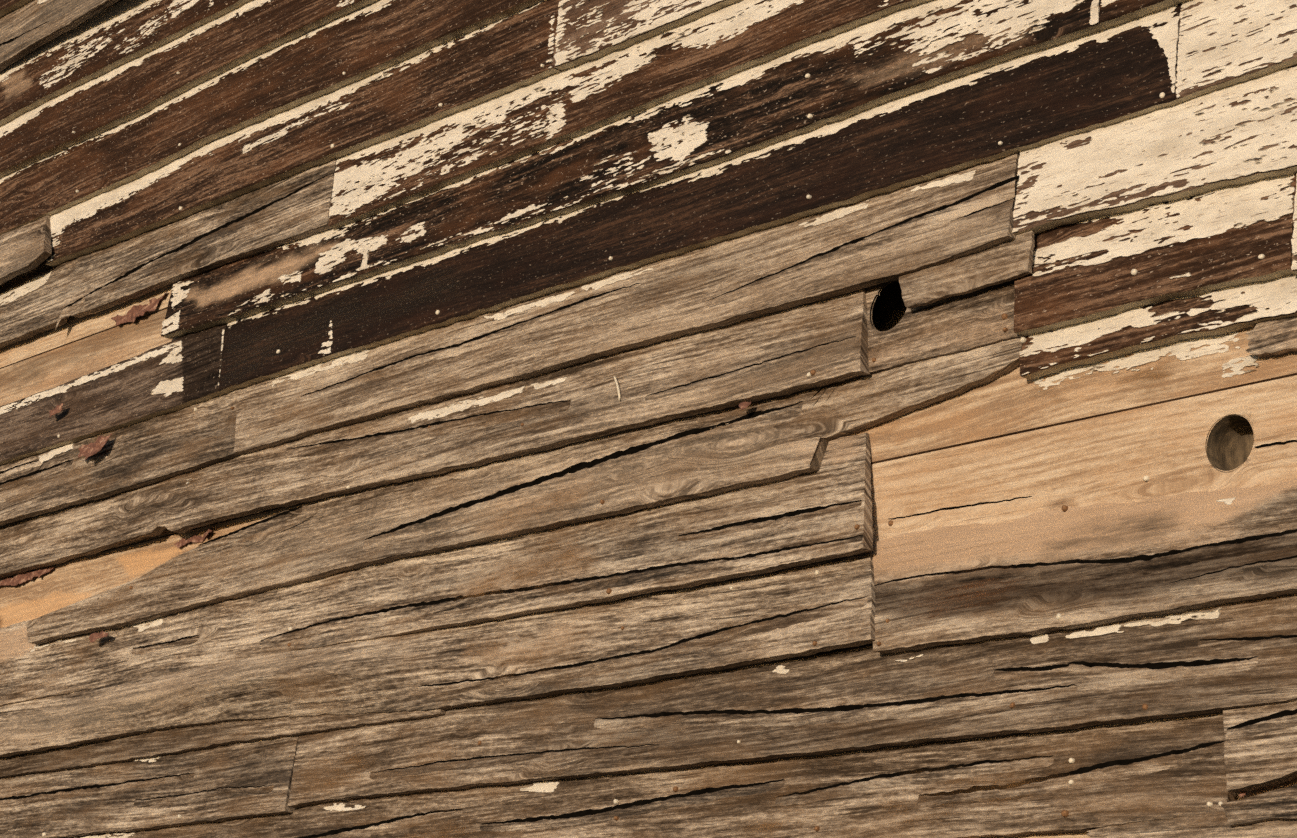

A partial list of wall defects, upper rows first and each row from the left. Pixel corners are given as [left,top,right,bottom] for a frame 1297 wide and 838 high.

peeling [0,0,1297,392]
crack [0,459,74,492]
peeling [39,443,74,463]
peeling [0,280,194,415]
peeling [408,377,567,423]
crack [363,401,803,551]
crack [0,773,274,808]
crack [132,635,200,655]
crack [259,496,1032,648]
crack [295,709,1297,838]
crack [370,635,1297,780]
crack [418,529,1297,696]